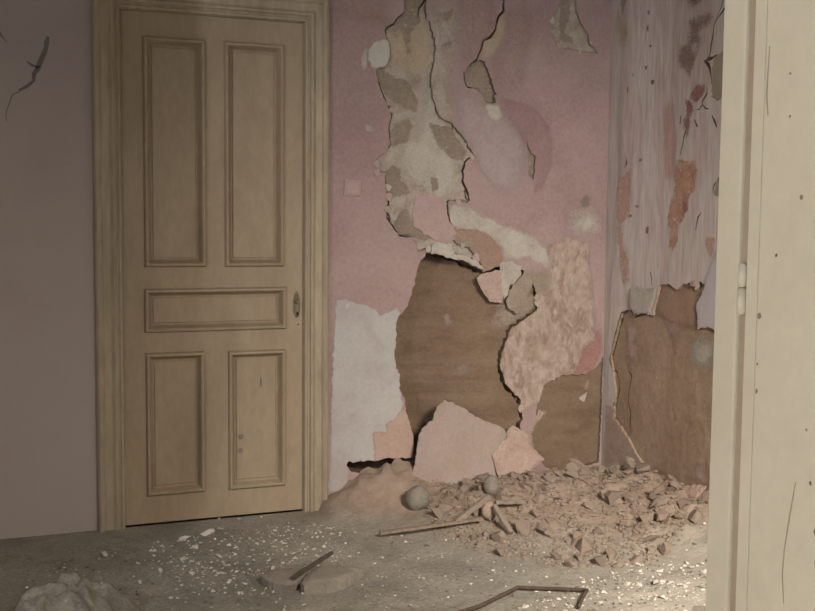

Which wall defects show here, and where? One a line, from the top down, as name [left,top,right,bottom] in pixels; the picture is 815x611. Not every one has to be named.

flaking render [347,0,715,492]
flaking render [711,51,723,101]